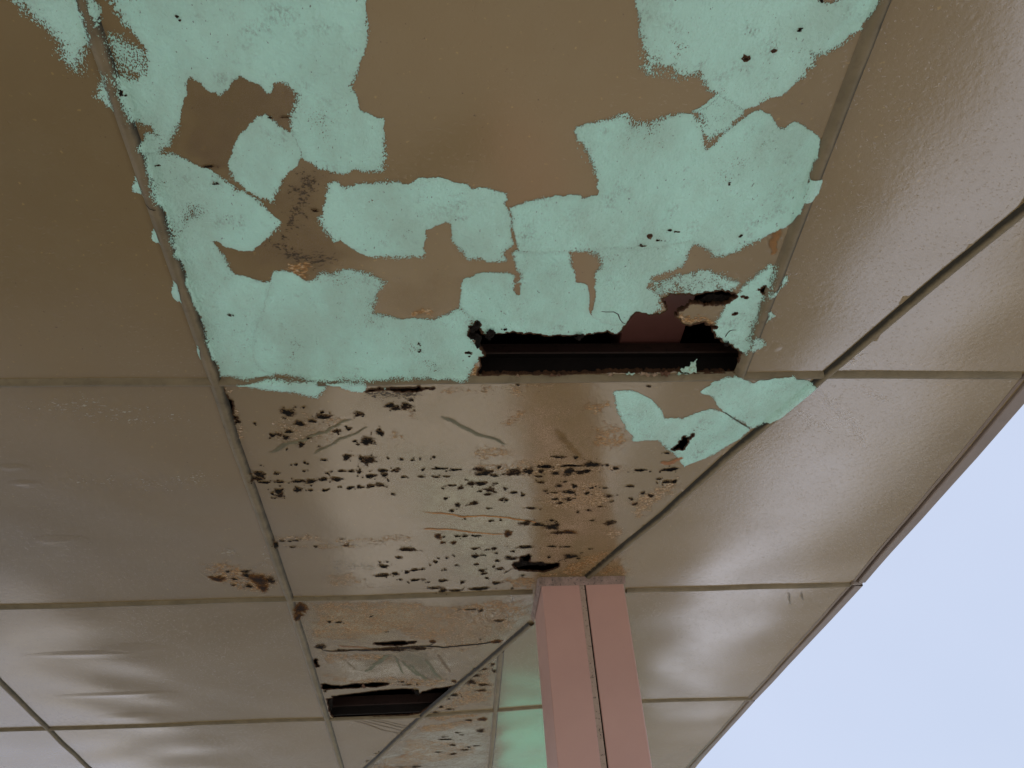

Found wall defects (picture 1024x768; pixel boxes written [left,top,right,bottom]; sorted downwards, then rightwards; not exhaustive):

peeling [696,293,731,302]
peeling [468,321,507,349]
peeling [678,359,697,375]
leakage [269,376,646,642]
leakage [301,600,495,706]